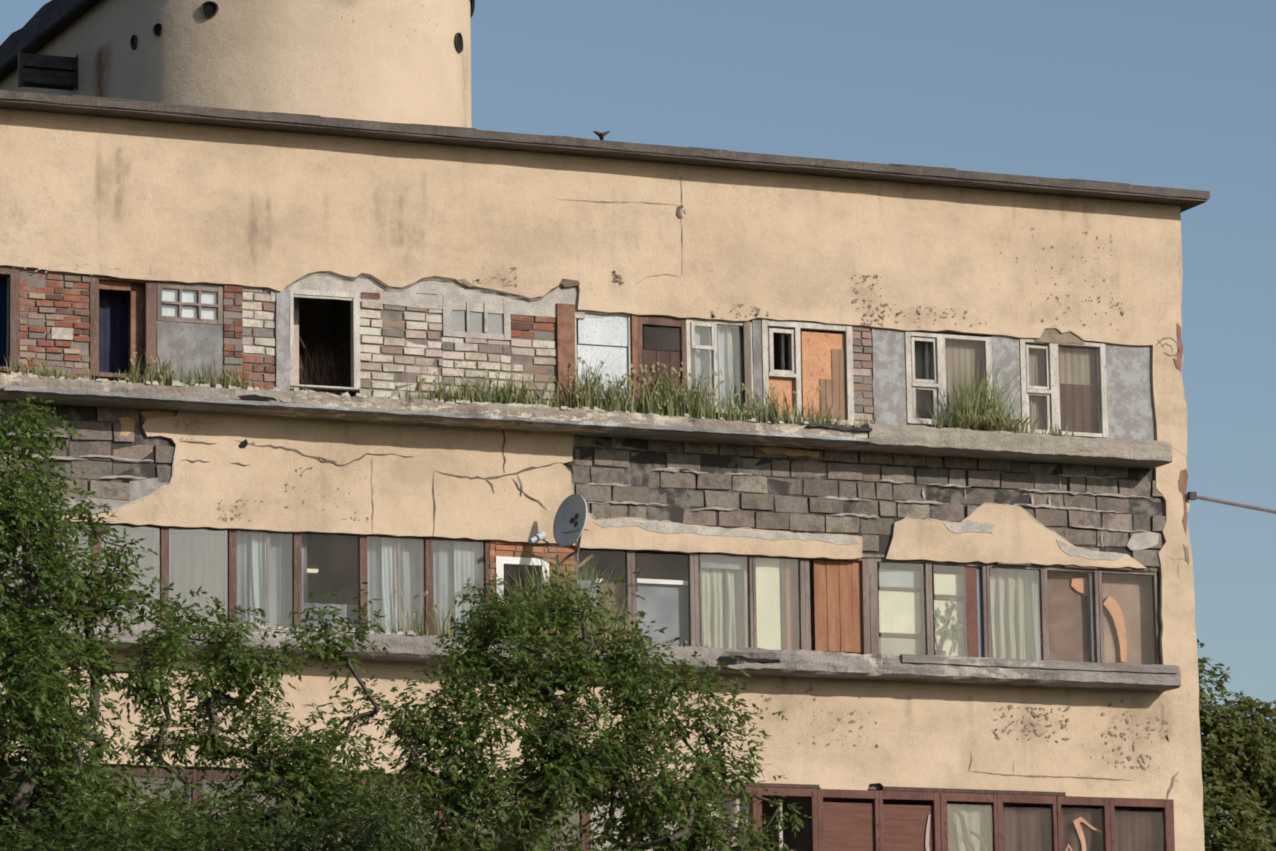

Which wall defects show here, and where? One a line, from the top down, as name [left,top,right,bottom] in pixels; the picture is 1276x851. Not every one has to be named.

spalling [270,267,609,319]
spalling [238,394,293,403]
spalling [0,400,212,516]
crack [179,430,563,535]
spalling [562,435,1166,573]
spalling [1178,469,1189,564]
spalling [578,549,688,586]